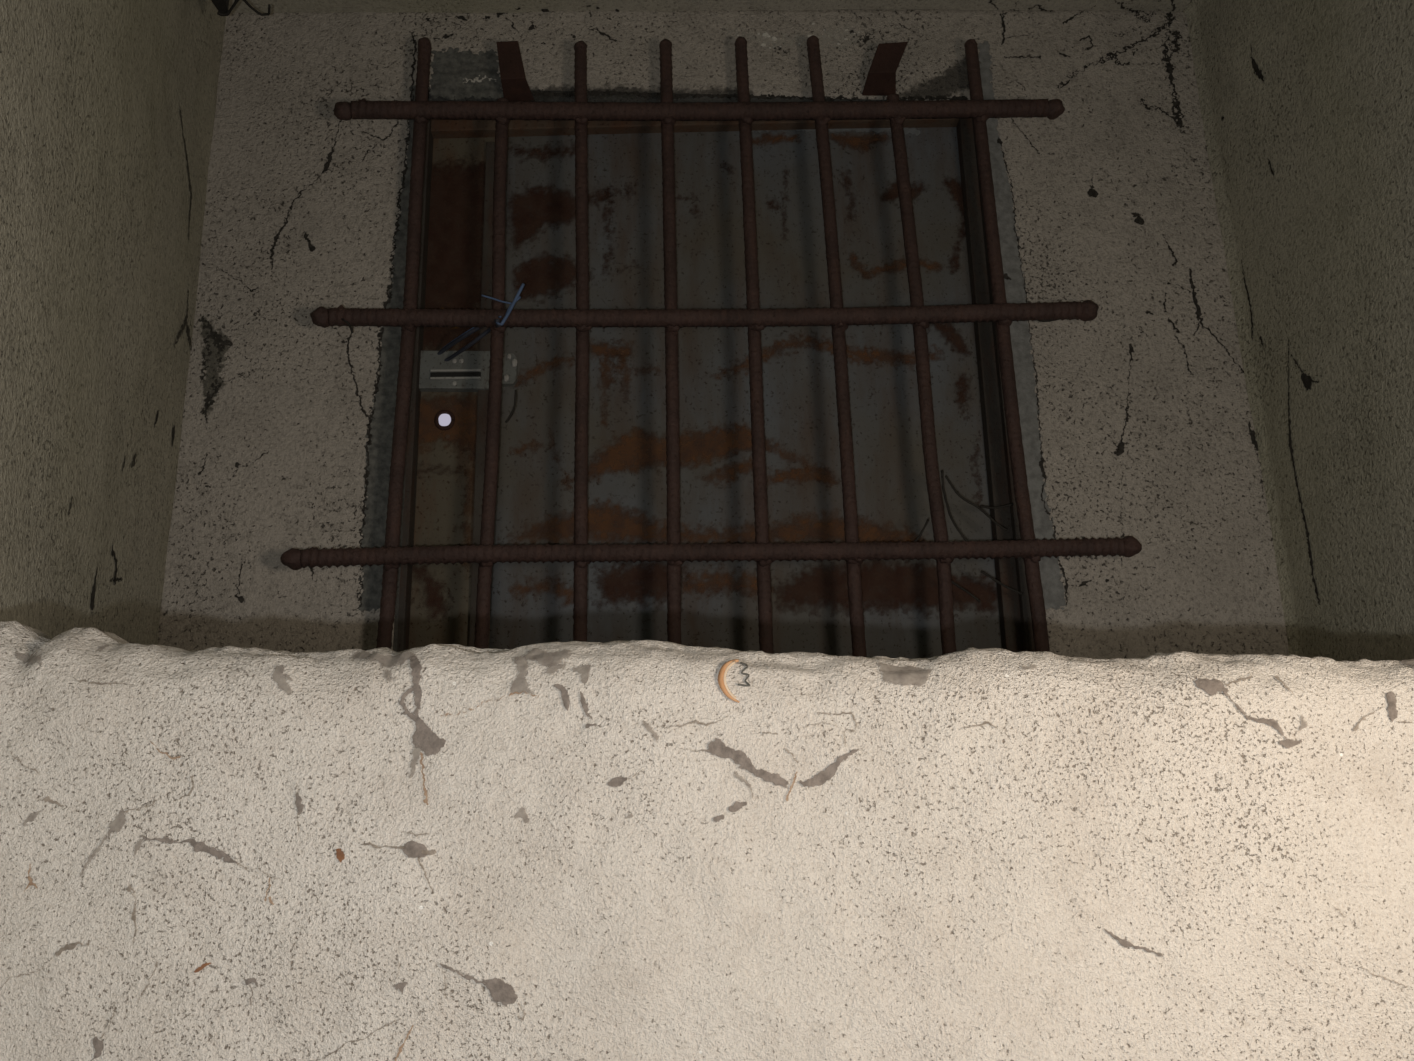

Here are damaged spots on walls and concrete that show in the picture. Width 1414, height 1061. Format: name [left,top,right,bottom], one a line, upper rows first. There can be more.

corrosion [509,186,576,249]
corrosion [418,393,478,450]
crack [1139,234,1320,605]
crack [666,720,721,728]